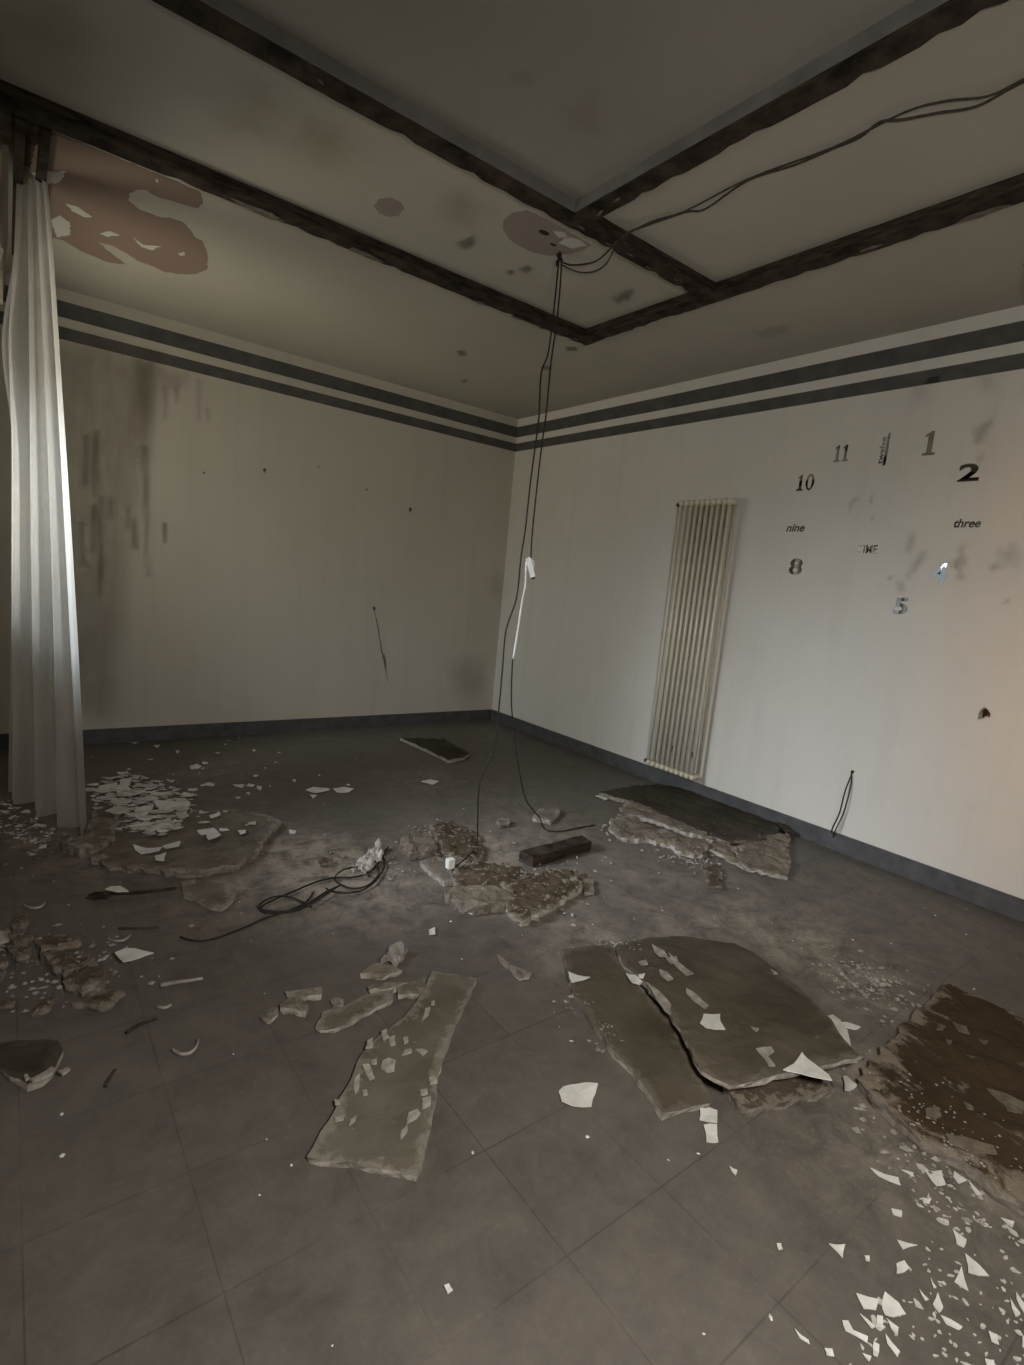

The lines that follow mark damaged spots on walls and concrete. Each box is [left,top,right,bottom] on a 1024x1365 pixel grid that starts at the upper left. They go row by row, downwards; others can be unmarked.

peeling [29,135,208,275]